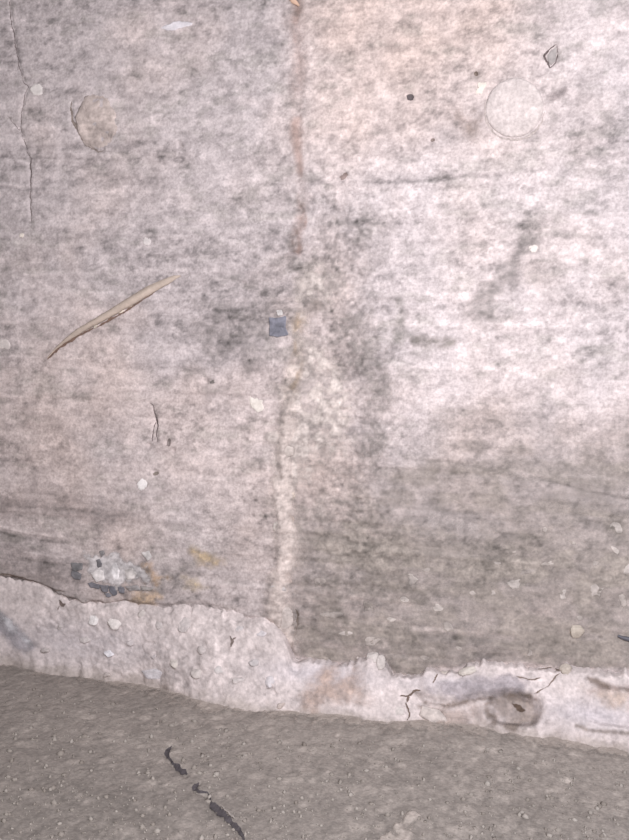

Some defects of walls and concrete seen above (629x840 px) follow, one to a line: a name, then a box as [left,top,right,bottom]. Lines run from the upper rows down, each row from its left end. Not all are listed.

crack [8,2,32,221]
spalling [0,550,629,757]
crack [400,674,438,720]
crack [444,694,494,707]
crack [517,667,560,694]